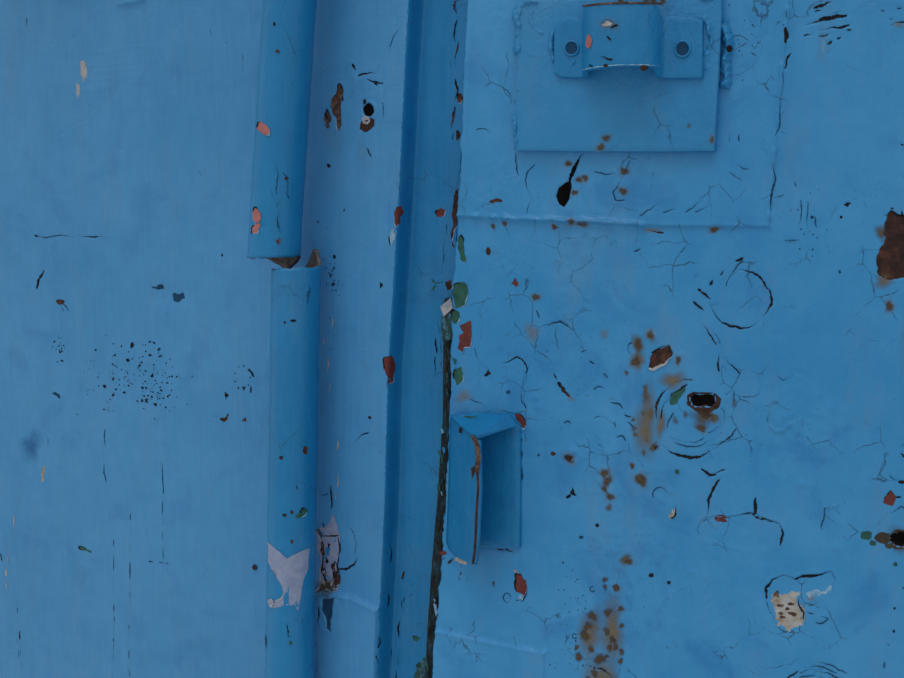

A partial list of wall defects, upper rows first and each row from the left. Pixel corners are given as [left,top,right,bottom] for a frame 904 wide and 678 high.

peeling [76,60,87,97]
peeling [324,83,344,131]
crack [451,79,488,140]
crack [769,10,796,218]
crack [594,161,710,216]
rust [876,207,904,285]
peeling [431,279,472,385]
crack [693,257,773,345]
peeling [267,514,341,635]
peeling [764,572,835,633]
rust [575,607,624,678]